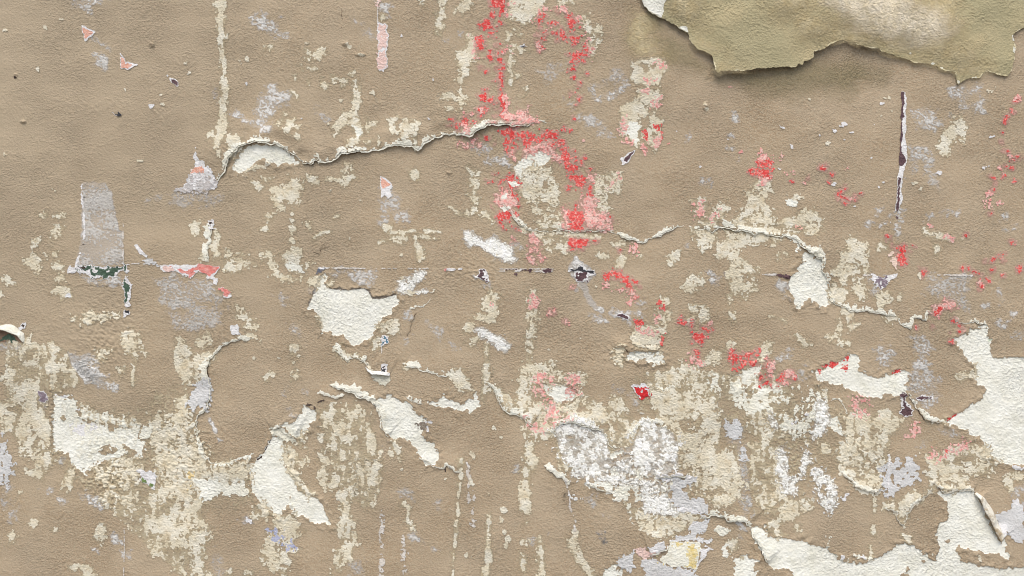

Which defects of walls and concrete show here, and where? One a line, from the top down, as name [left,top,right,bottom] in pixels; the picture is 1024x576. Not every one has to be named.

peeling [188,42,430,364]
peeling [418,0,644,300]
peeling [0,328,439,576]
peeling [491,157,1024,576]